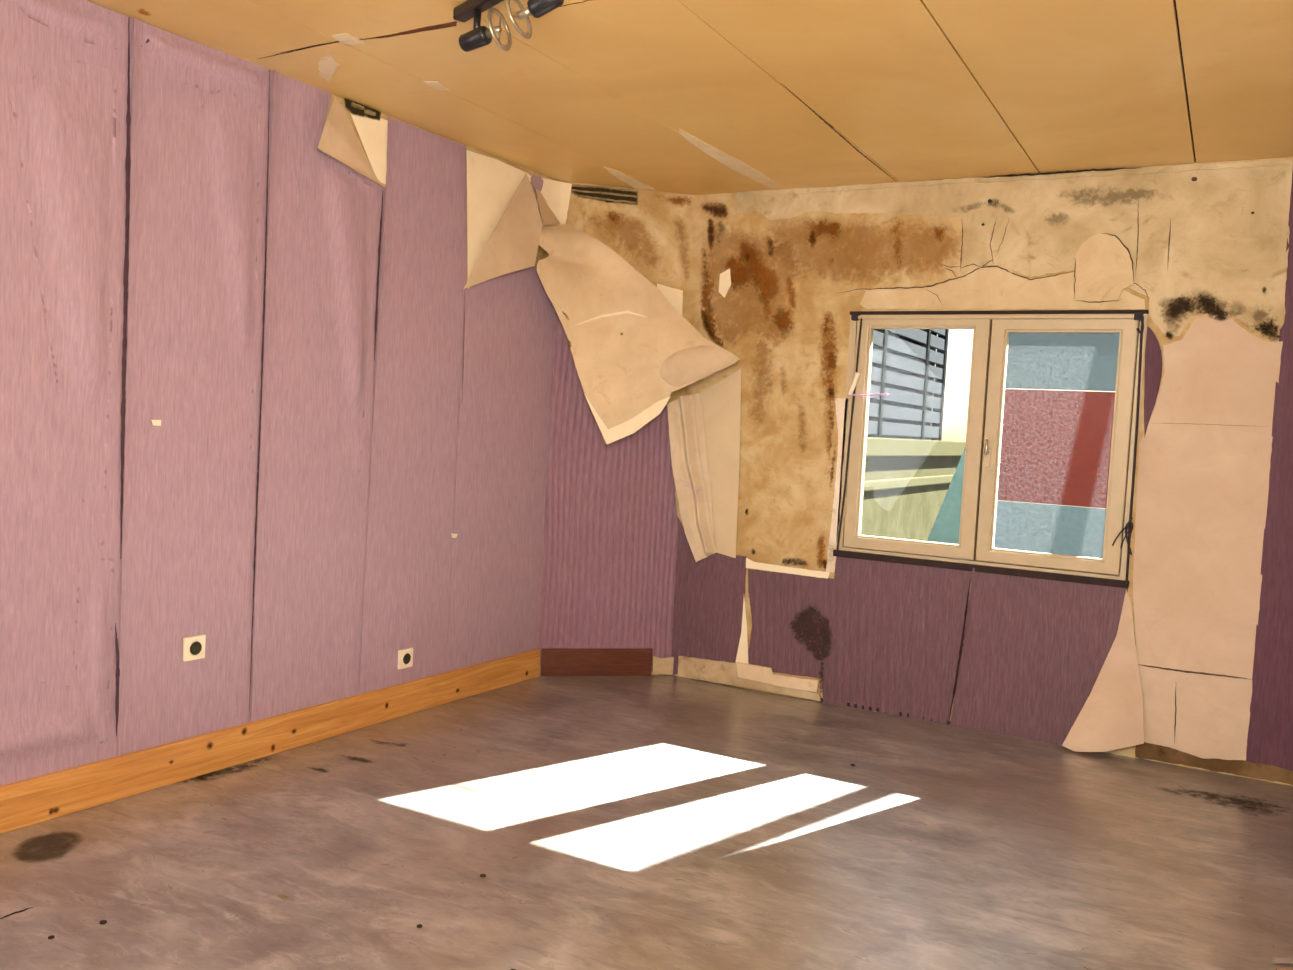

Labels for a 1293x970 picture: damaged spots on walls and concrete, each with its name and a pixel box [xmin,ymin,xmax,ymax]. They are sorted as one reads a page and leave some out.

spalling [344,98,381,120]
spalling [571,184,638,205]
damp [701,203,727,347]
damp [725,239,795,332]
damp [809,220,841,246]
crack [838,204,1171,303]
peeling [732,160,1293,338]
crack [977,167,1140,178]
damp [1162,295,1280,339]
peeling [826,398,848,572]
damp [791,606,832,692]